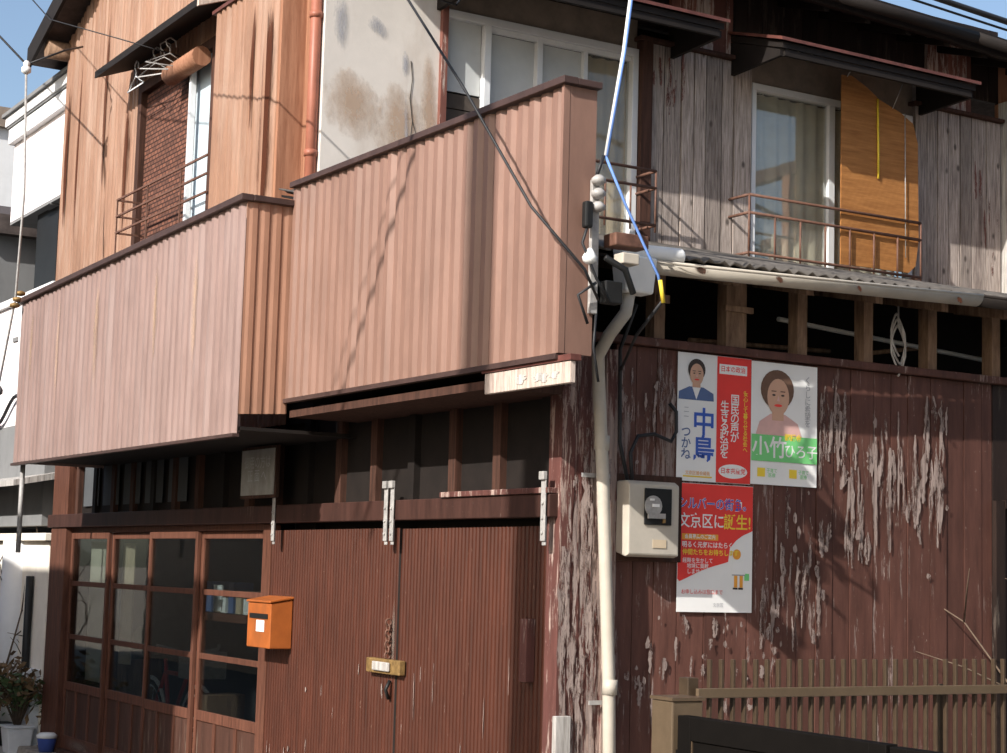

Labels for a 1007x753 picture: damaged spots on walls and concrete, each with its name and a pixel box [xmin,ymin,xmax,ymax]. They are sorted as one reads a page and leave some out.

leakage [389,72,434,142]
peeling [622,365,676,441]
peeling [818,379,949,568]
peeling [556,428,602,753]
peeling [736,488,832,680]
peeling [613,611,689,710]
peeling [689,613,743,677]